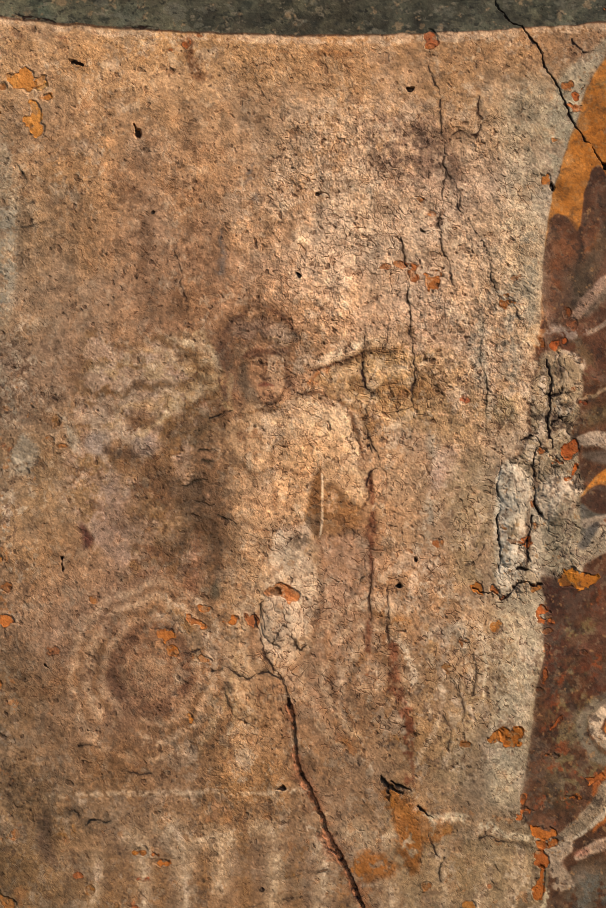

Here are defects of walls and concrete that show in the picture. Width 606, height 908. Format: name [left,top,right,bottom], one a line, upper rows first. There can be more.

peeling [0,66,53,138]
crack [498,9,605,170]
peeling [379,260,442,292]
crack [396,65,527,437]
crack [361,336,380,486]
crack [467,360,562,601]
peeling [264,583,300,605]
peeling [558,568,601,591]
crack [211,601,364,908]
peeling [487,726,527,748]
crack [380,776,445,882]
peeling [516,793,558,900]